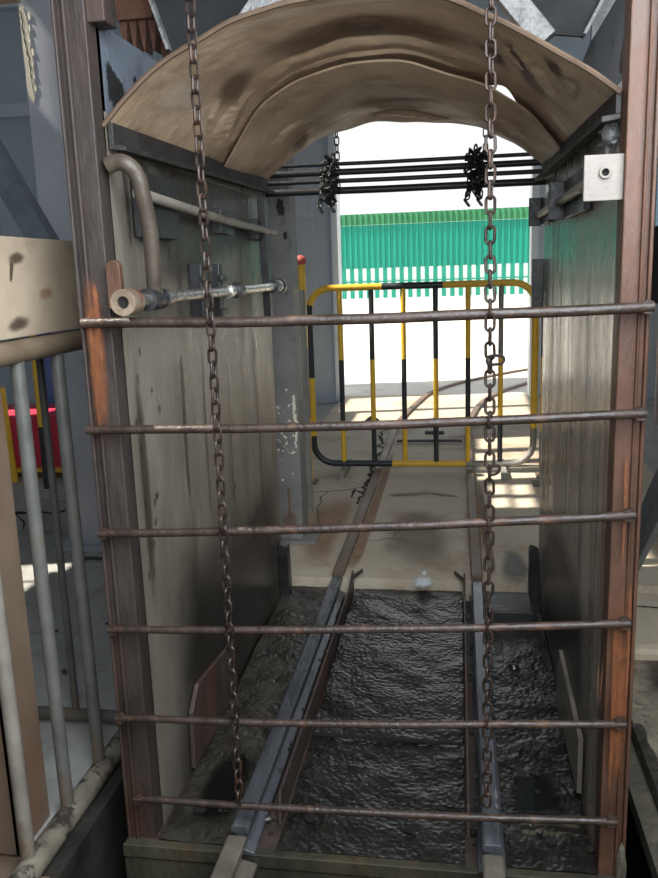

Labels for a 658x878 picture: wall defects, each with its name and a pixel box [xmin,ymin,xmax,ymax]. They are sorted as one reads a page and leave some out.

rust [87,287,107,426]
crack [315,429,388,523]